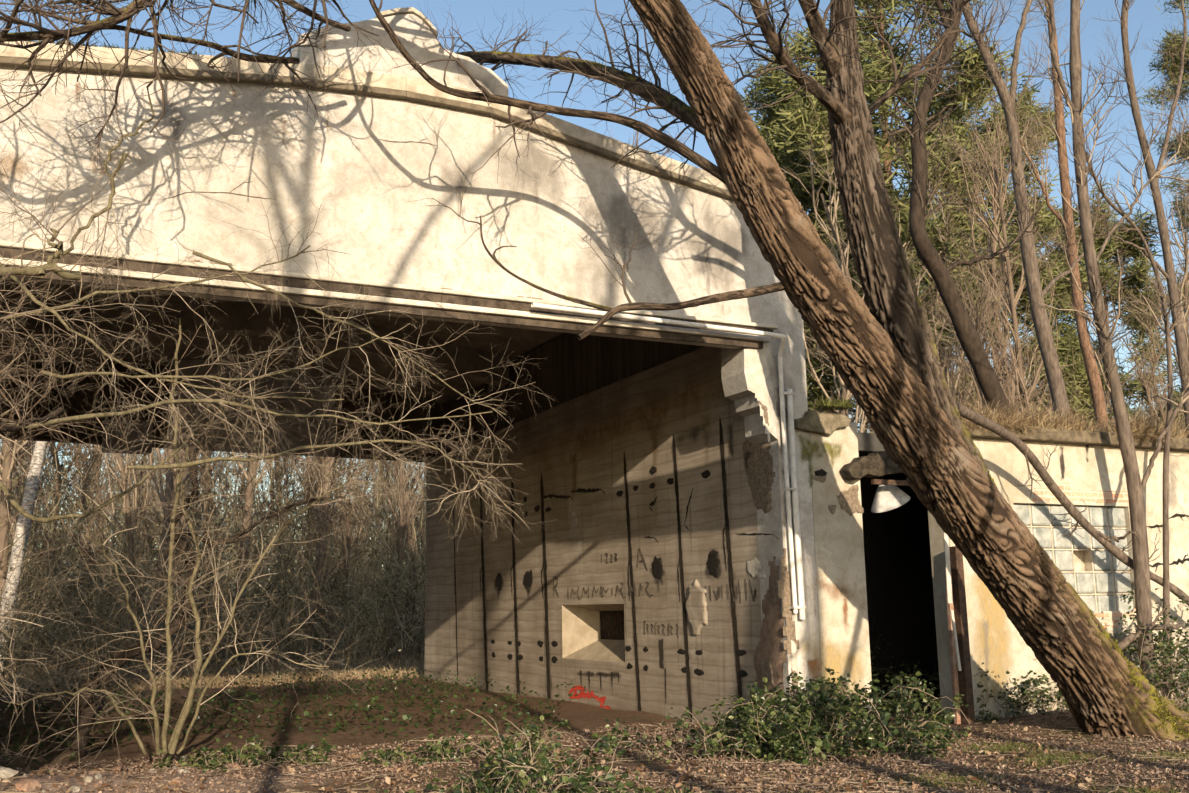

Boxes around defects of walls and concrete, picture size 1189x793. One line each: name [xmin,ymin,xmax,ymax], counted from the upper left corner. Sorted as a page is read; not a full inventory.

leakage [694,230,744,271]
spalling [1032,483,1129,505]
spalling [747,548,799,722]